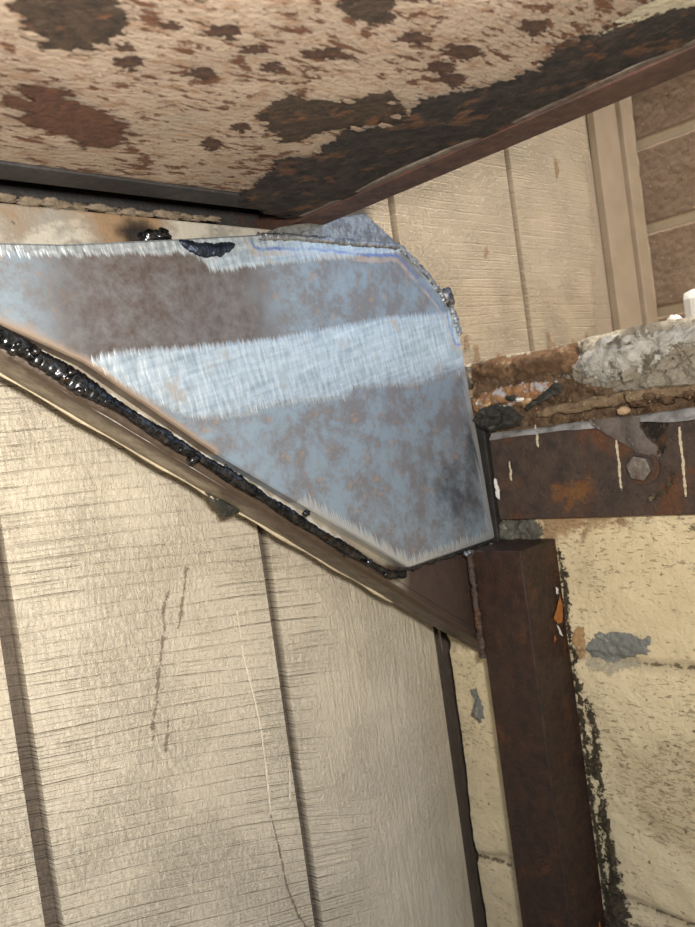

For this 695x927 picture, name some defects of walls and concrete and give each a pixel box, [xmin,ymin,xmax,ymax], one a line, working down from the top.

corrosion [4,0,146,74]
corrosion [158,21,184,30]
corrosion [178,67,219,81]
corrosion [194,24,287,75]
corrosion [334,0,398,27]
peeling [602,0,695,34]
corrosion [3,83,142,150]
corrosion [229,6,695,220]
corrosion [198,137,226,153]
spalling [470,321,695,412]
corrosion [554,596,563,624]
crack [272,822,307,927]